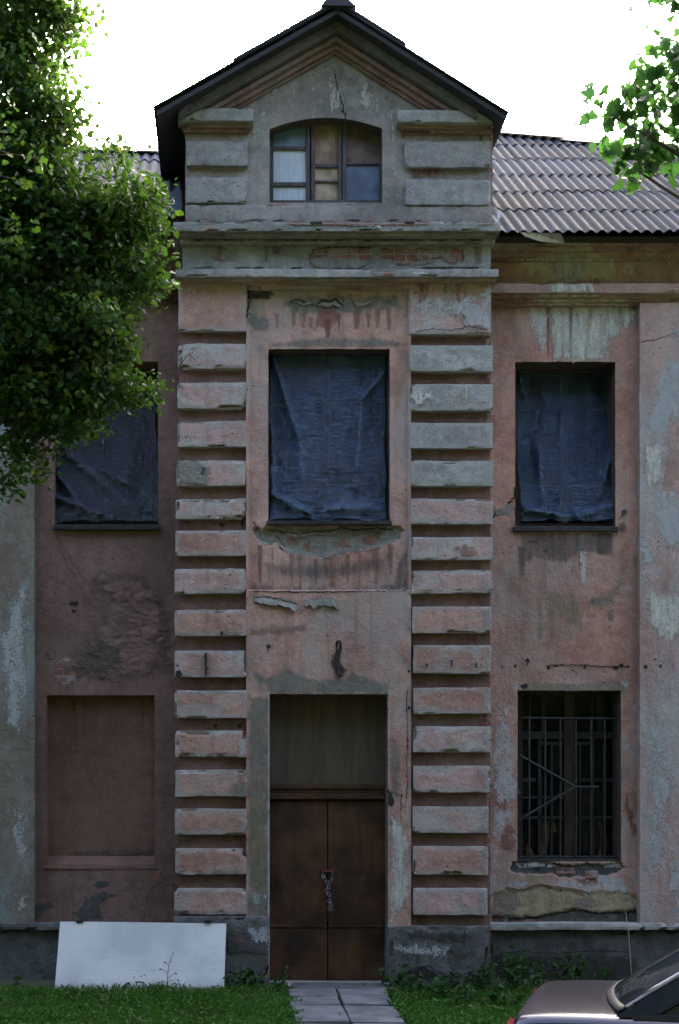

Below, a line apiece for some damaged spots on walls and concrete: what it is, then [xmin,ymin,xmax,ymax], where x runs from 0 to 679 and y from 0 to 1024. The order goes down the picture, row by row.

crack [333,70,347,122]
flaking render [308,246,464,276]
peeling [411,289,491,345]
water stain [520,236,646,363]
flaking render [253,526,403,560]
flaking render [485,705,637,922]